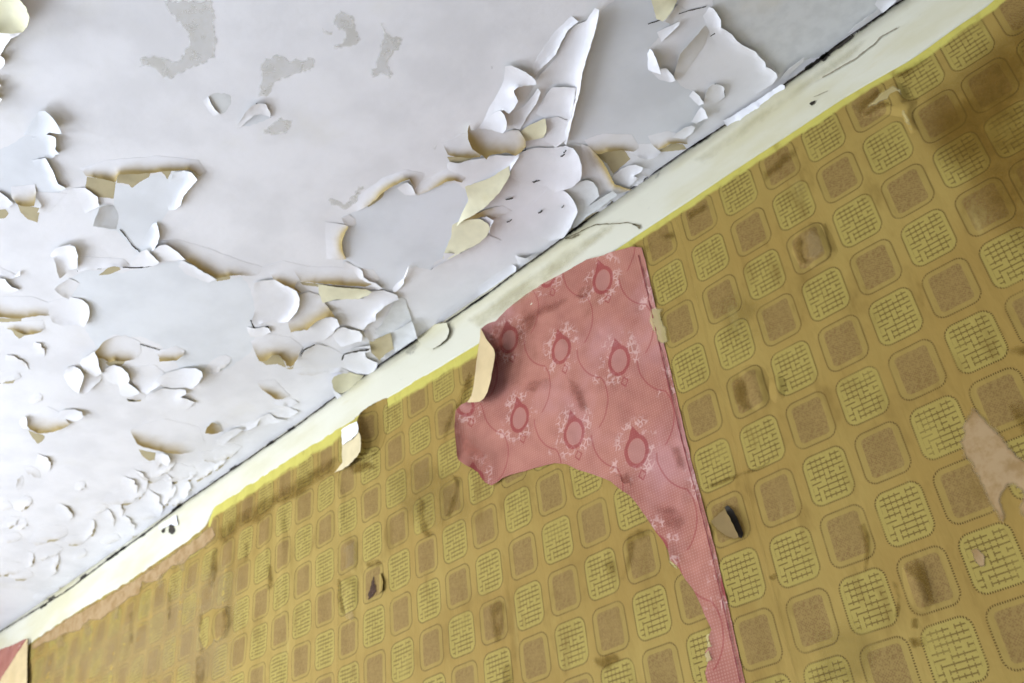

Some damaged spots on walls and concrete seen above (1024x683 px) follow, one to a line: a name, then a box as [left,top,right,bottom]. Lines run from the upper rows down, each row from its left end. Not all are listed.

peeling [0,0,896,599]